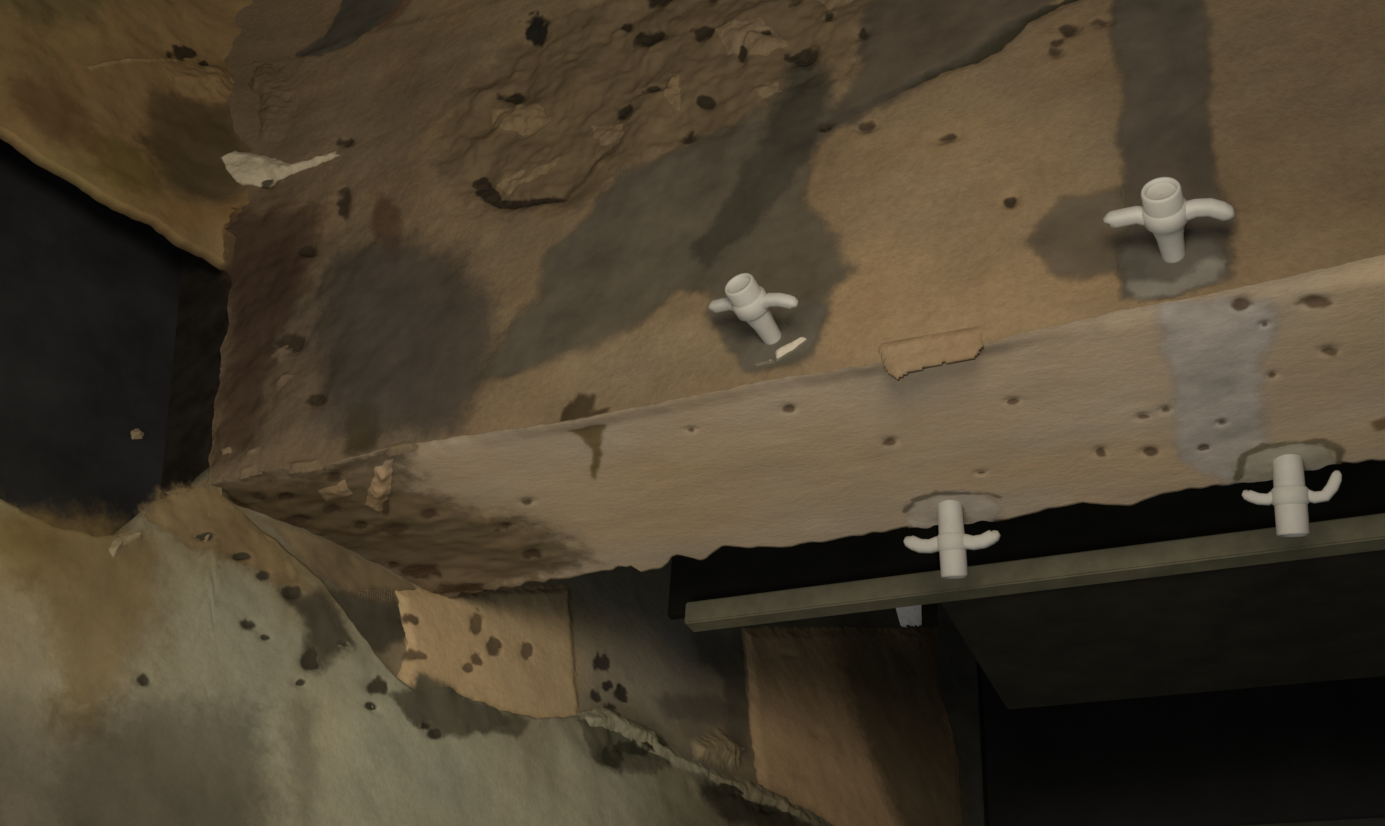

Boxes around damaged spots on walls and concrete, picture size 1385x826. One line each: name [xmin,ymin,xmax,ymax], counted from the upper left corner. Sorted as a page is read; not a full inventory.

leakage [295,0,403,56]
spalling [621,24,665,46]
spalling [695,13,818,65]
crack [899,0,1077,93]
spalling [487,93,562,139]
spalling [643,70,715,142]
flaking render [222,139,353,187]
spalling [494,152,565,199]
leakage [1029,0,1234,296]
leakage [325,0,1050,451]
flaking render [878,326,984,381]
spalling [577,707,834,826]